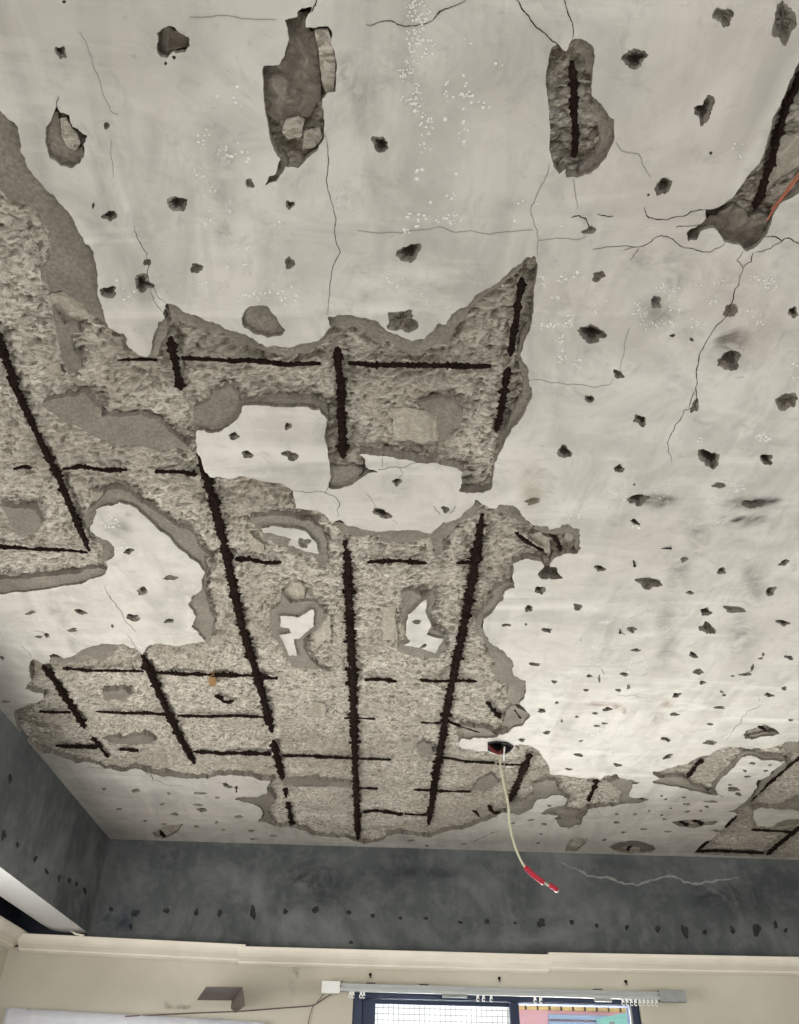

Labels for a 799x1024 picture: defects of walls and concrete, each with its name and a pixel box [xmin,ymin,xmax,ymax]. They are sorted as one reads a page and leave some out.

spalling [245,7,337,188]
crack [325,136,341,307]
crack [369,0,466,27]
crack [517,0,574,45]
spalling [545,39,615,178]
spalling [687,63,799,251]
rust [751,71,799,210]
rust [0,332,128,554]
rust [117,277,528,459]
spalling [0,107,799,858]
crack [364,169,799,458]
rust [39,453,533,840]